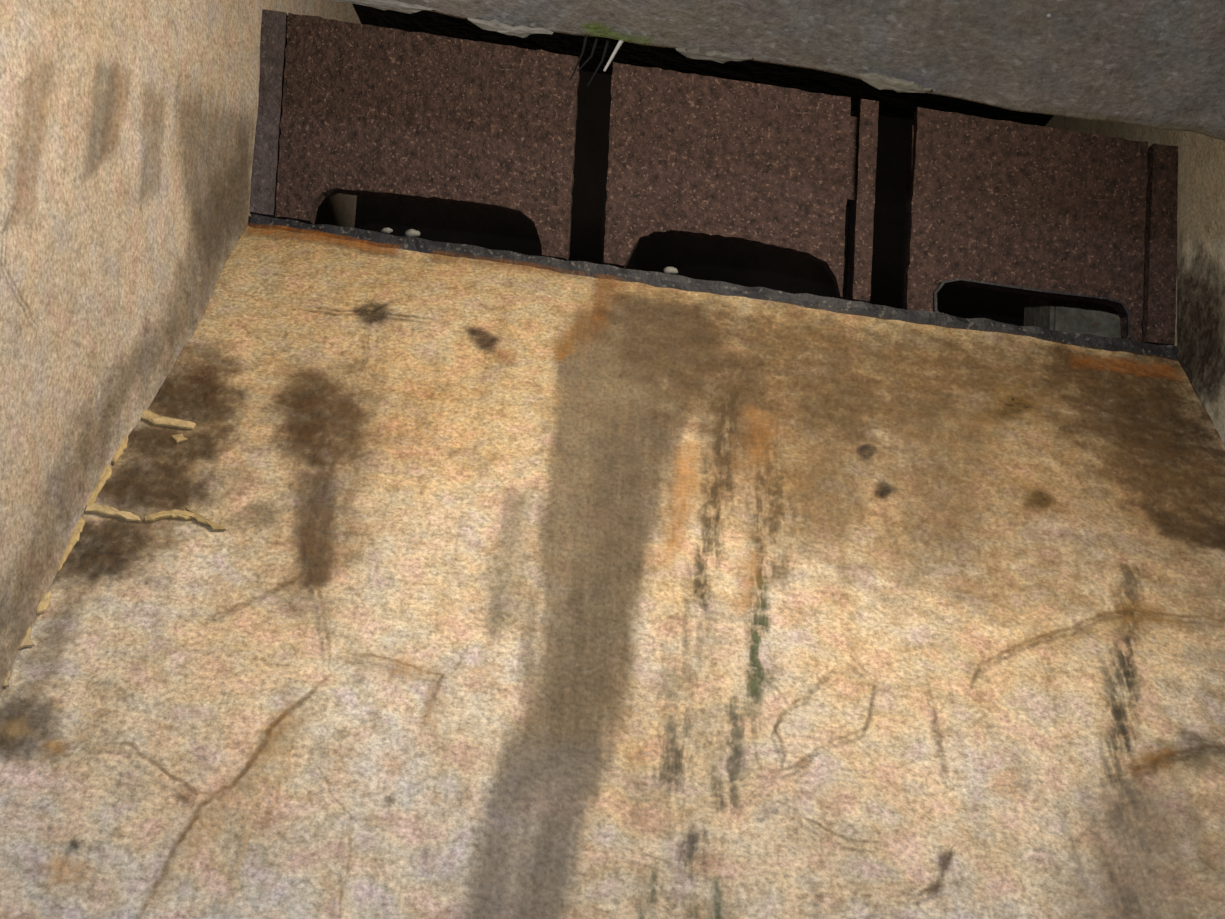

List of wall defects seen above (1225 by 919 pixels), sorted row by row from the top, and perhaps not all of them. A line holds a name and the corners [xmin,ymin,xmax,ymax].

crack [331,303,417,321]
spalling [18,593,51,649]
damp [64,522,144,578]
spalling [57,435,226,573]
spalling [141,409,196,444]
damp [103,376,242,508]
damp [279,375,364,580]
damp [476,297,714,919]
crack [998,609,1194,656]
damp [1049,256,1225,549]
crack [239,696,307,777]
crack [128,743,203,873]